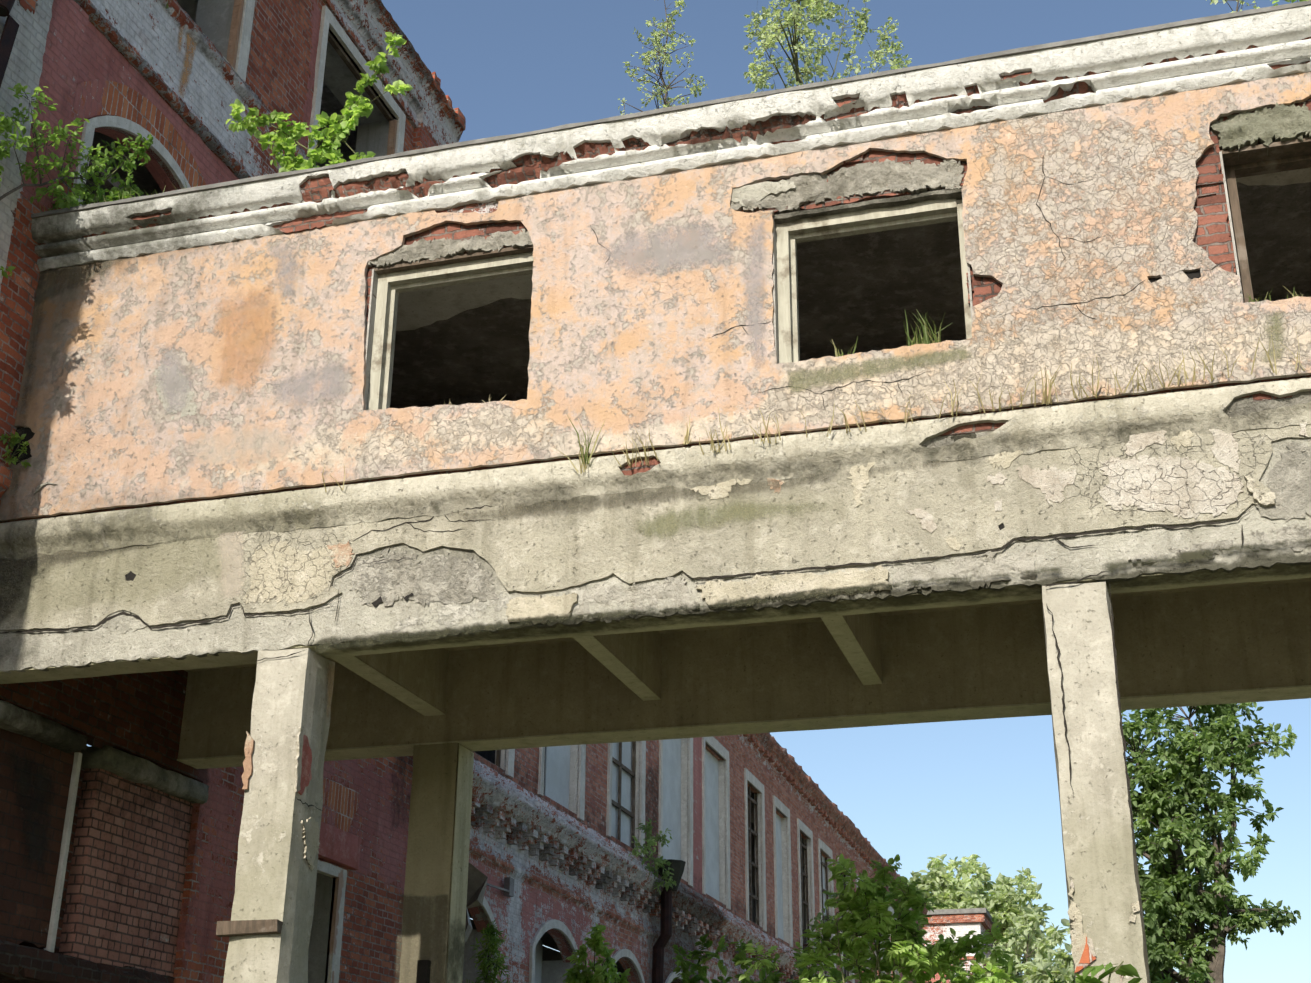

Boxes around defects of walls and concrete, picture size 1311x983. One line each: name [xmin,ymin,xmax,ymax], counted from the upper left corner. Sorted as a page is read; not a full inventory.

flaking render [272,172,444,234]
flaking render [368,229,533,275]
flaking render [436,97,868,214]
flaking render [730,150,964,224]
crack [1036,164,1104,273]
crack [1027,281,1143,319]
flaking render [1196,102,1311,198]
peeling [1097,392,1311,565]
flaking render [243,508,1037,626]
crack [684,506,1254,843]